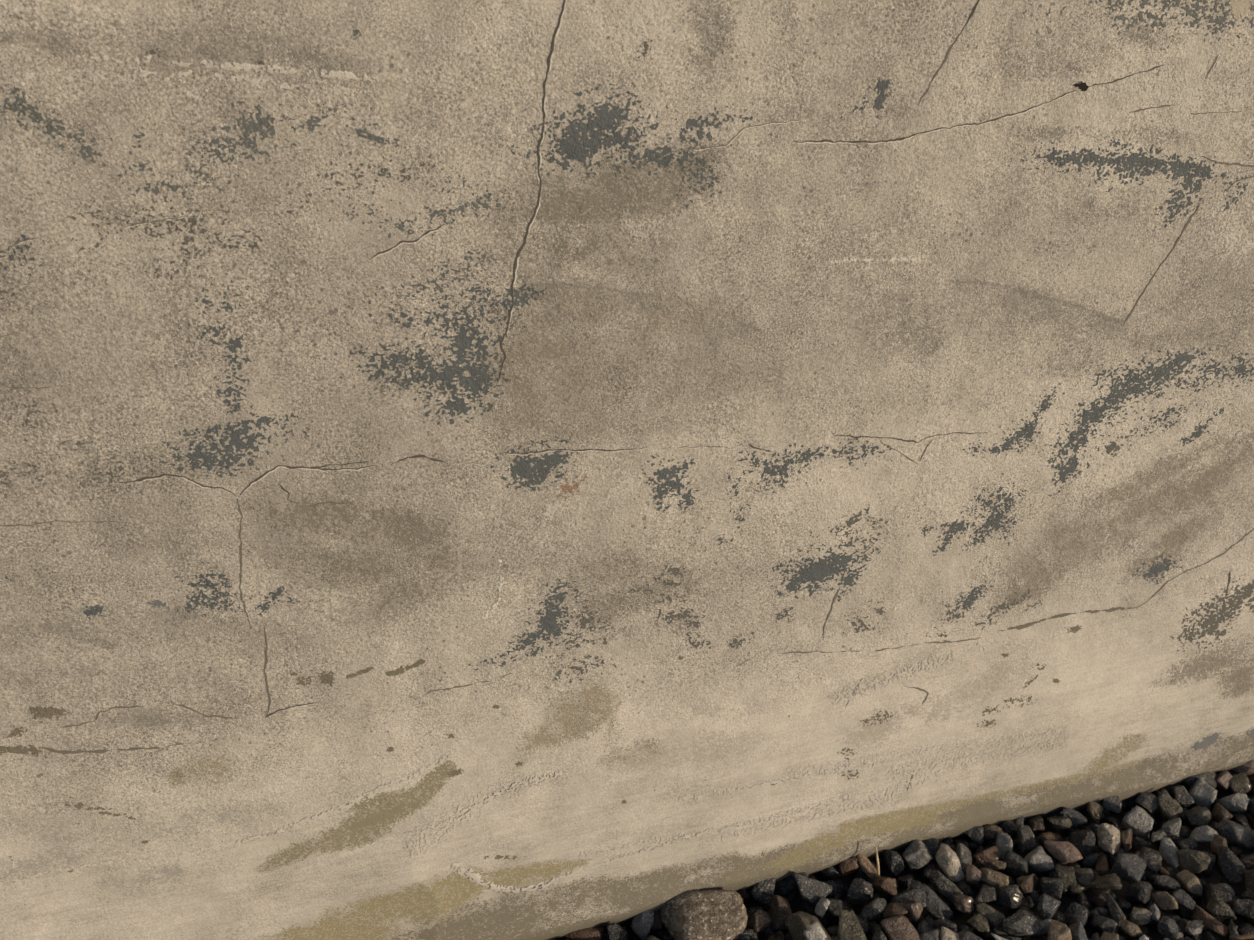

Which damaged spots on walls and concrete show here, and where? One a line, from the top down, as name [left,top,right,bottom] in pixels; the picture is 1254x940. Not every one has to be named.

peeling [0,77,547,501]
crack [497,0,567,383]
peeling [511,71,753,215]
crack [663,0,1162,157]
peeling [1009,139,1251,228]
crack [1124,156,1254,324]
peeling [963,343,1254,497]
crack [0,455,448,754]
peeling [443,574,616,692]
peeling [771,503,895,634]
crack [783,529,1254,708]
damp [0,795,293,899]